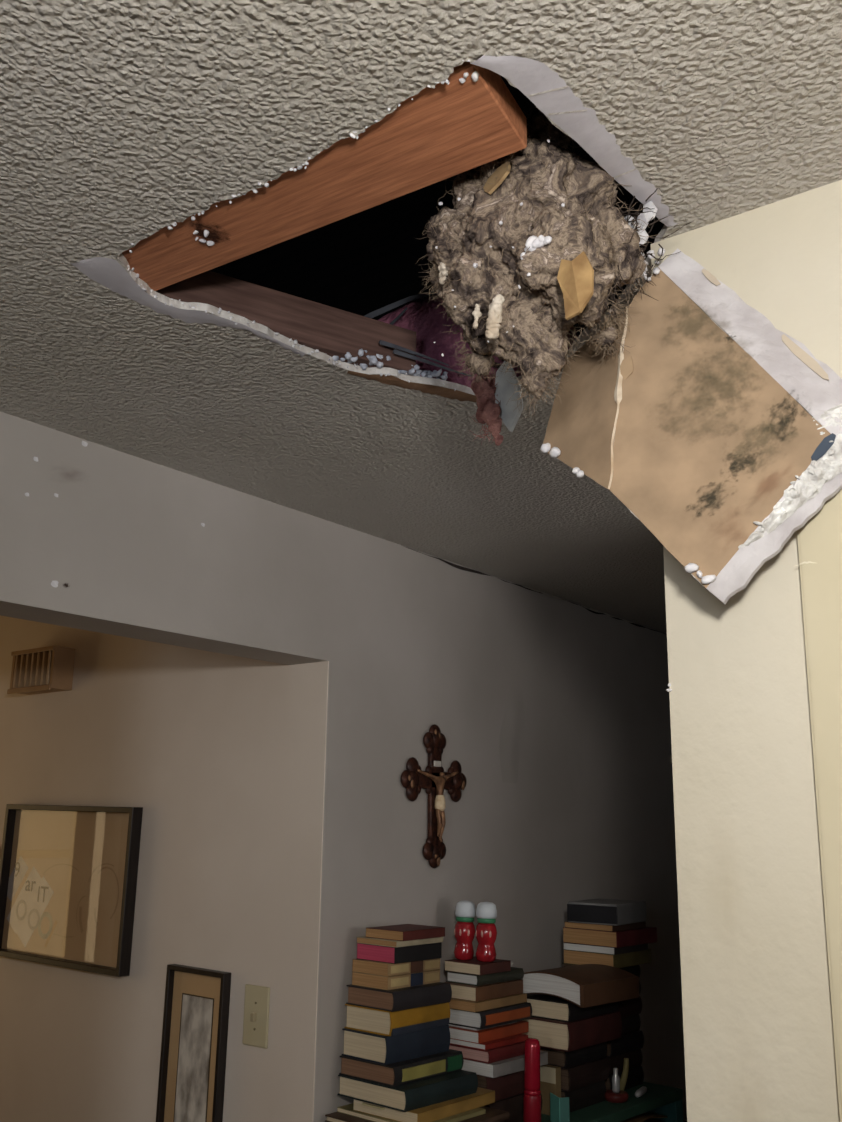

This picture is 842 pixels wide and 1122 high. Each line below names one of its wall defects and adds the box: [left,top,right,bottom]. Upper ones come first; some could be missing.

peeling [512,235,552,260]
peeling [640,248,665,282]
mould [765,400,797,440]
peeling [540,443,561,458]
mould [729,454,756,472]
mould [698,487,720,515]
peeling [684,563,716,584]